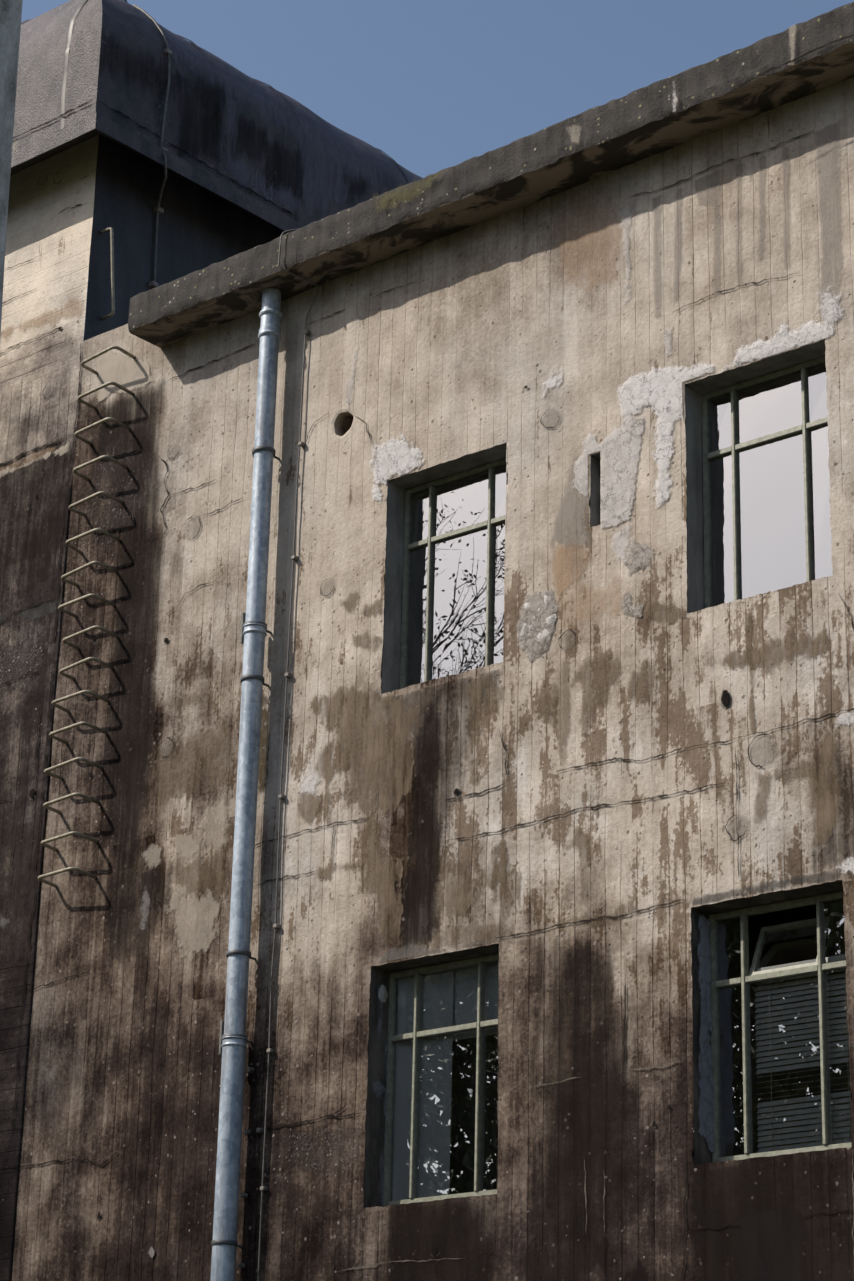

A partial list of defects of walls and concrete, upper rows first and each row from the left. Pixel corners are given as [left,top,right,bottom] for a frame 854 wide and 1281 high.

spalling [516,589,558,662]
crack [0,321,117,1177]
damp [298,685,521,961]
damp [572,828,587,853]
damp [542,653,654,757]
damp [755,729,839,843]